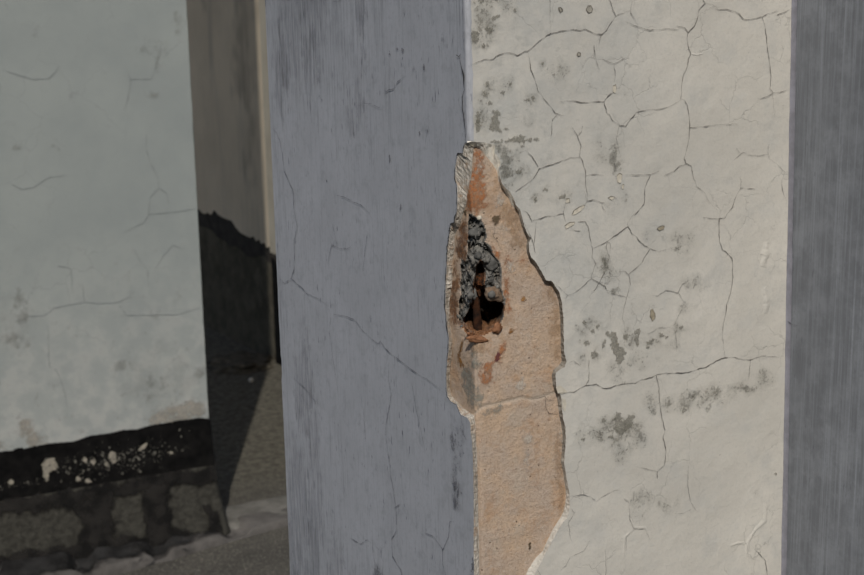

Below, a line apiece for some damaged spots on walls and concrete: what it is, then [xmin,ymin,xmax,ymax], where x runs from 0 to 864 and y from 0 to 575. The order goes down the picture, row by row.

mould [475,82,538,177]
crack [457,1,788,478]
crack [272,128,446,575]
spalling [444,141,570,575]
mould [582,321,668,364]
peeling [41,401,204,483]
mould [602,412,635,438]